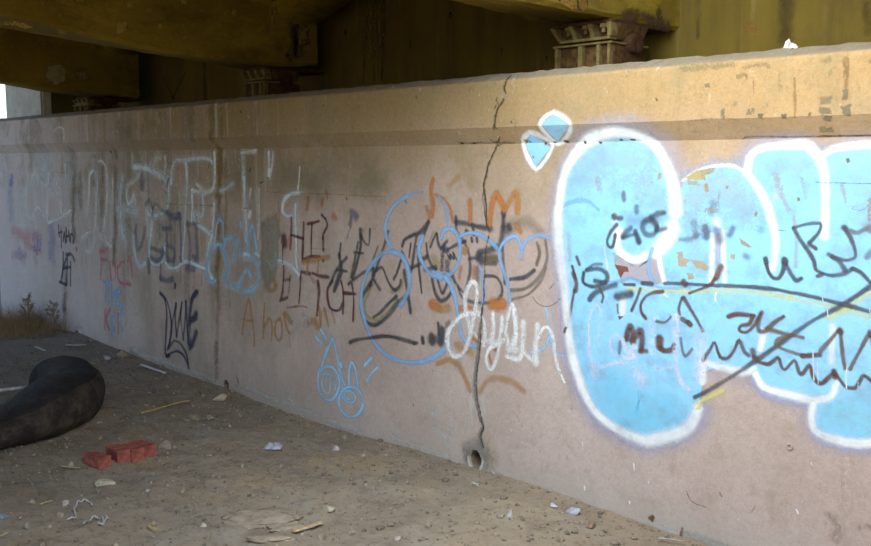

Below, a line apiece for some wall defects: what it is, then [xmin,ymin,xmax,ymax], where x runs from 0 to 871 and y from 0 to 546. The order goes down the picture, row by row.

crack [460,75,511,450]
crack [744,132,871,140]